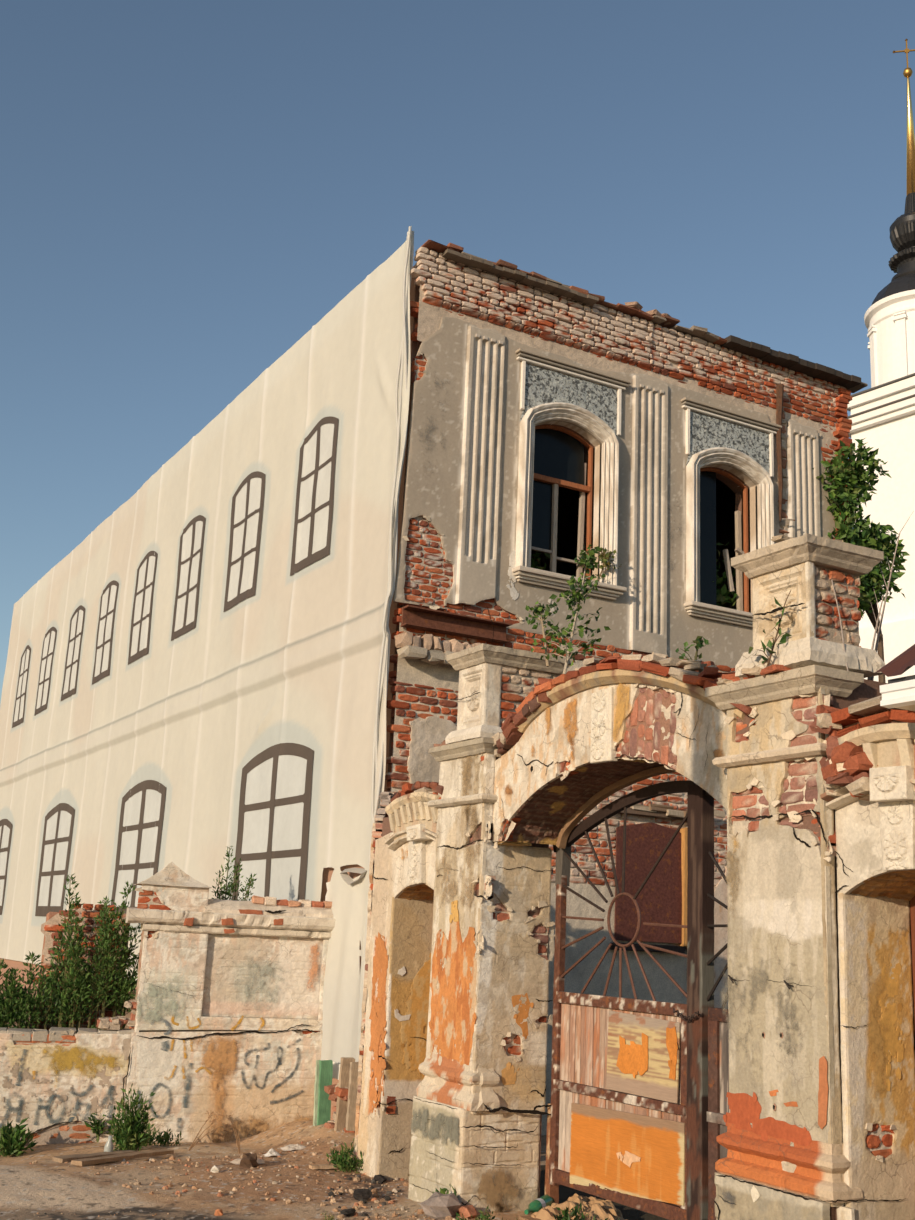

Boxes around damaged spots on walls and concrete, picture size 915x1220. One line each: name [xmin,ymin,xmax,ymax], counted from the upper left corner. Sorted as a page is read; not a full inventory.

spalling [399,516,524,625]
spalling [613,683,677,771]
spalling [731,694,878,862]
spalling [471,875,555,961]
crack [121,1024,316,1118]
peeling [324,823,484,1170]
peeling [500,993,553,1085]
peeling [723,1056,828,1146]
peeling [876,963,904,1091]